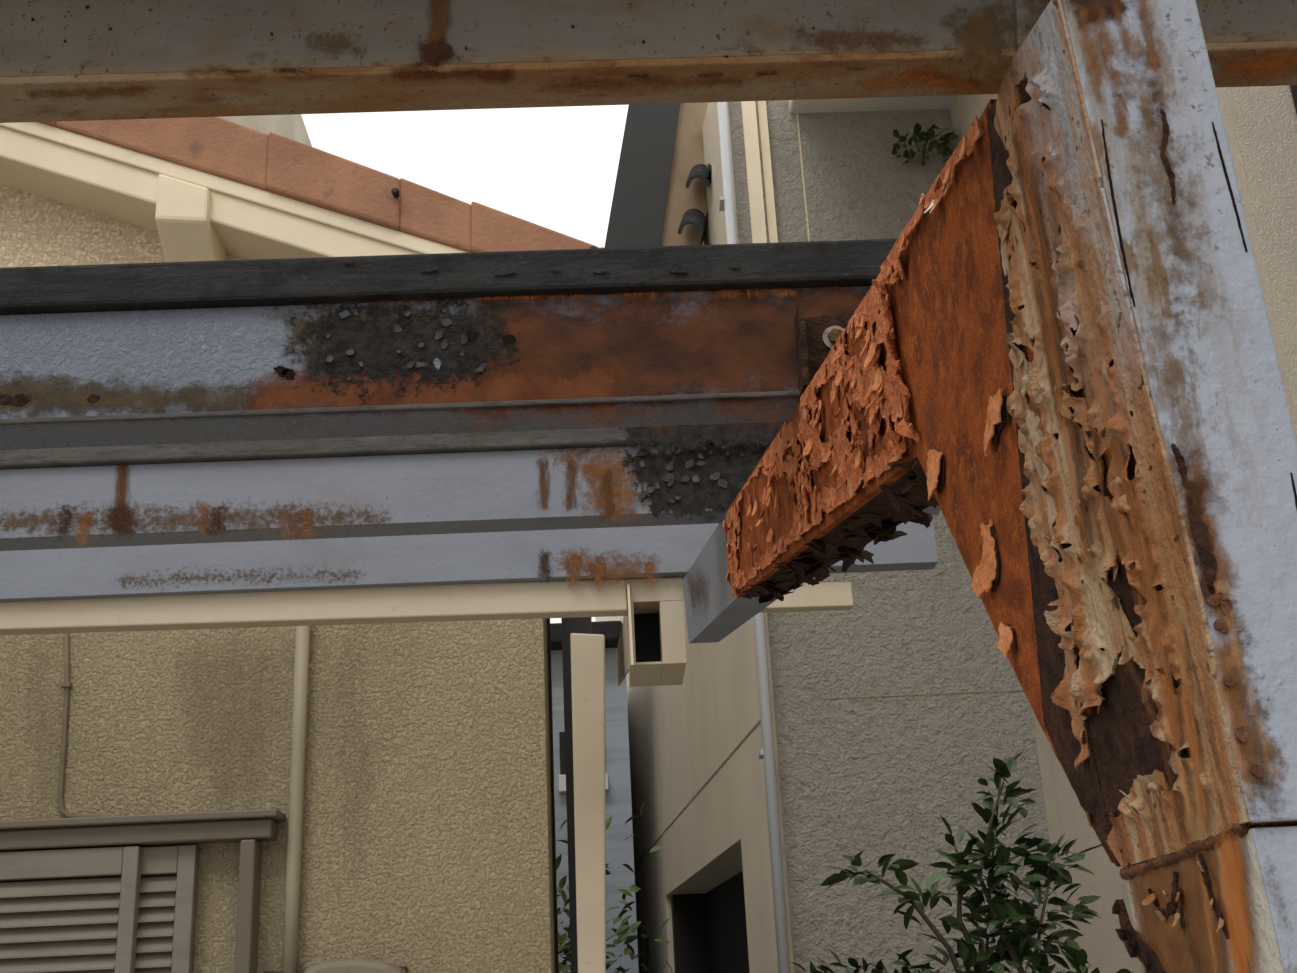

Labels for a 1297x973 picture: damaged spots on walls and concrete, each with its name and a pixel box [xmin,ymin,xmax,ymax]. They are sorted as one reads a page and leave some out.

rust [29,87,148,98]
rust [392,0,512,82]
rust [796,26,921,52]
peeling [1016,77,1032,107]
rust [1070,0,1203,339]
rust [0,464,389,546]
rust [0,284,870,520]
peeling [621,100,1187,867]
rust [1013,96,1207,841]
rust [1165,359,1283,815]
rust [1127,828,1253,973]